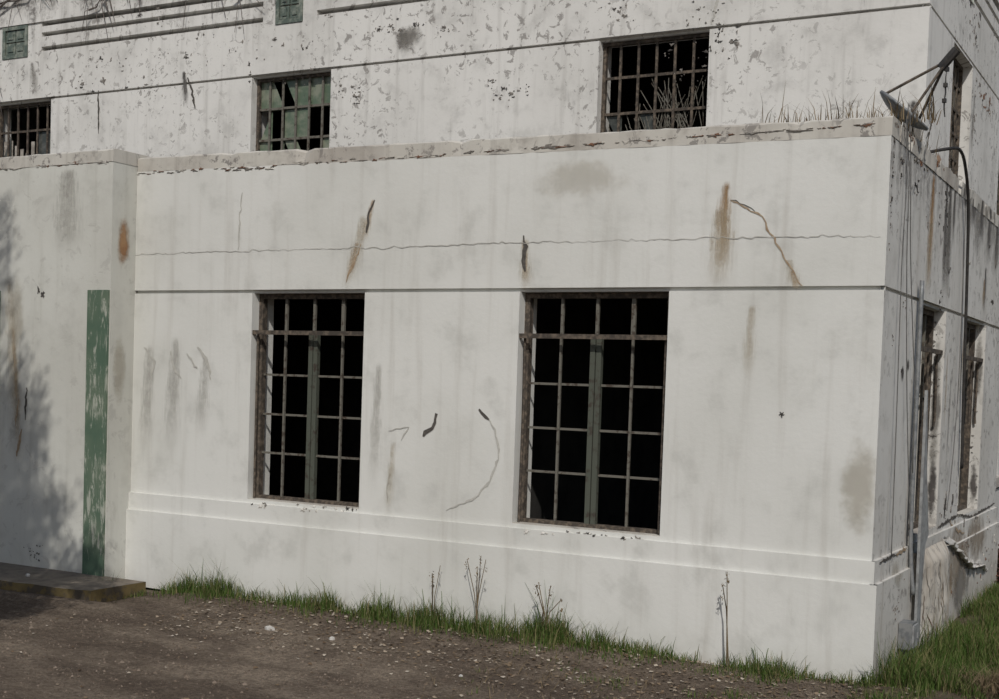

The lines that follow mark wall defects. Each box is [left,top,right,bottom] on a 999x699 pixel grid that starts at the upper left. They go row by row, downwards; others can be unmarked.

peeling [686,0,742,68]
rust [119,224,128,261]
crack [141,192,880,286]
rust [720,185,728,244]
peeling [940,491,996,572]